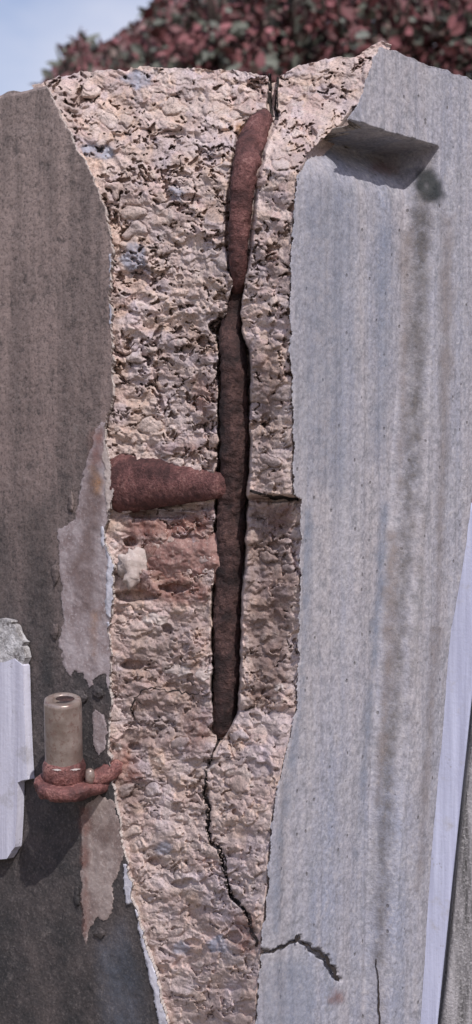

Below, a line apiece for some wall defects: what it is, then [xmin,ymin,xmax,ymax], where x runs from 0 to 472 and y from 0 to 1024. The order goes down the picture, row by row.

corrosion [129,109,286,737]
spalling [32,41,391,1024]
crack [202,739,340,981]